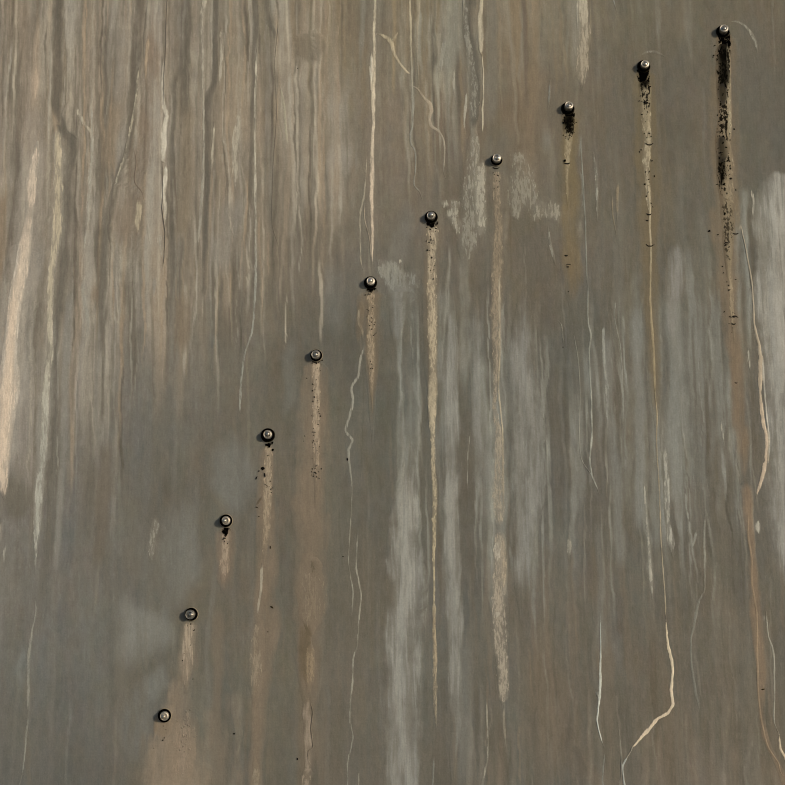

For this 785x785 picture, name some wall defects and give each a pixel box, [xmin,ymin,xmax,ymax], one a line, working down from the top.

water stain [380,167,547,785]
corrosion [556,110,585,313]
water stain [574,143,599,494]
crack [595,605,675,785]
water stain [690,510,707,712]
corrosion [706,29,785,785]
water stain [741,170,785,600]
crack [765,610,785,760]